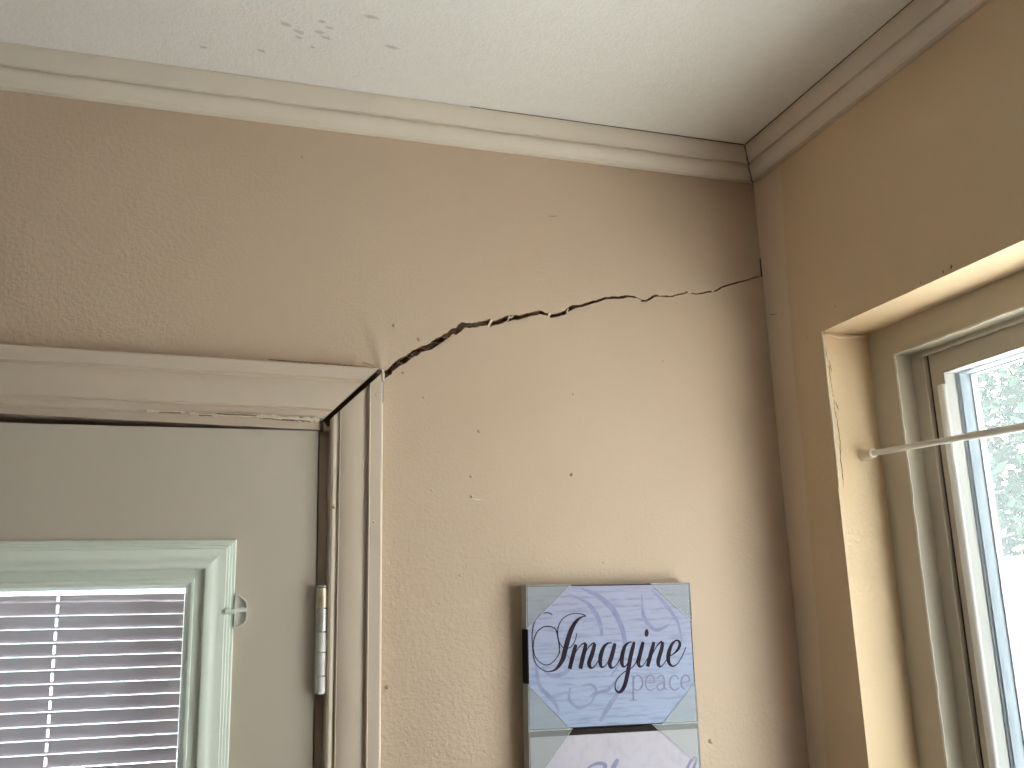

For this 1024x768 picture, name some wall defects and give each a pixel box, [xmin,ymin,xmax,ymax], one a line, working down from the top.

crack [268,258,763,378]